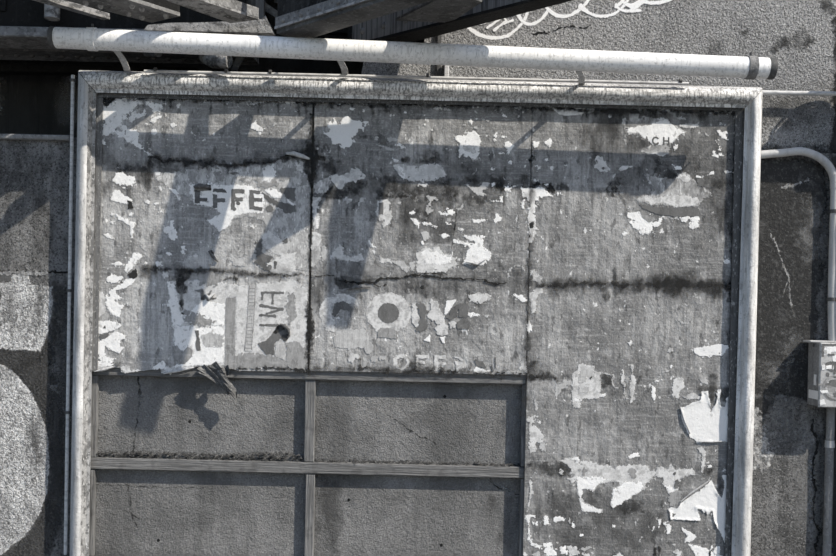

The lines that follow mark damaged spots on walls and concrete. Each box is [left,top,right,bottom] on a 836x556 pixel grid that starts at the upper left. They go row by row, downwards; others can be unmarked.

water stain [822,1,836,61]
water stain [812,72,836,169]
crack [810,419,822,556]